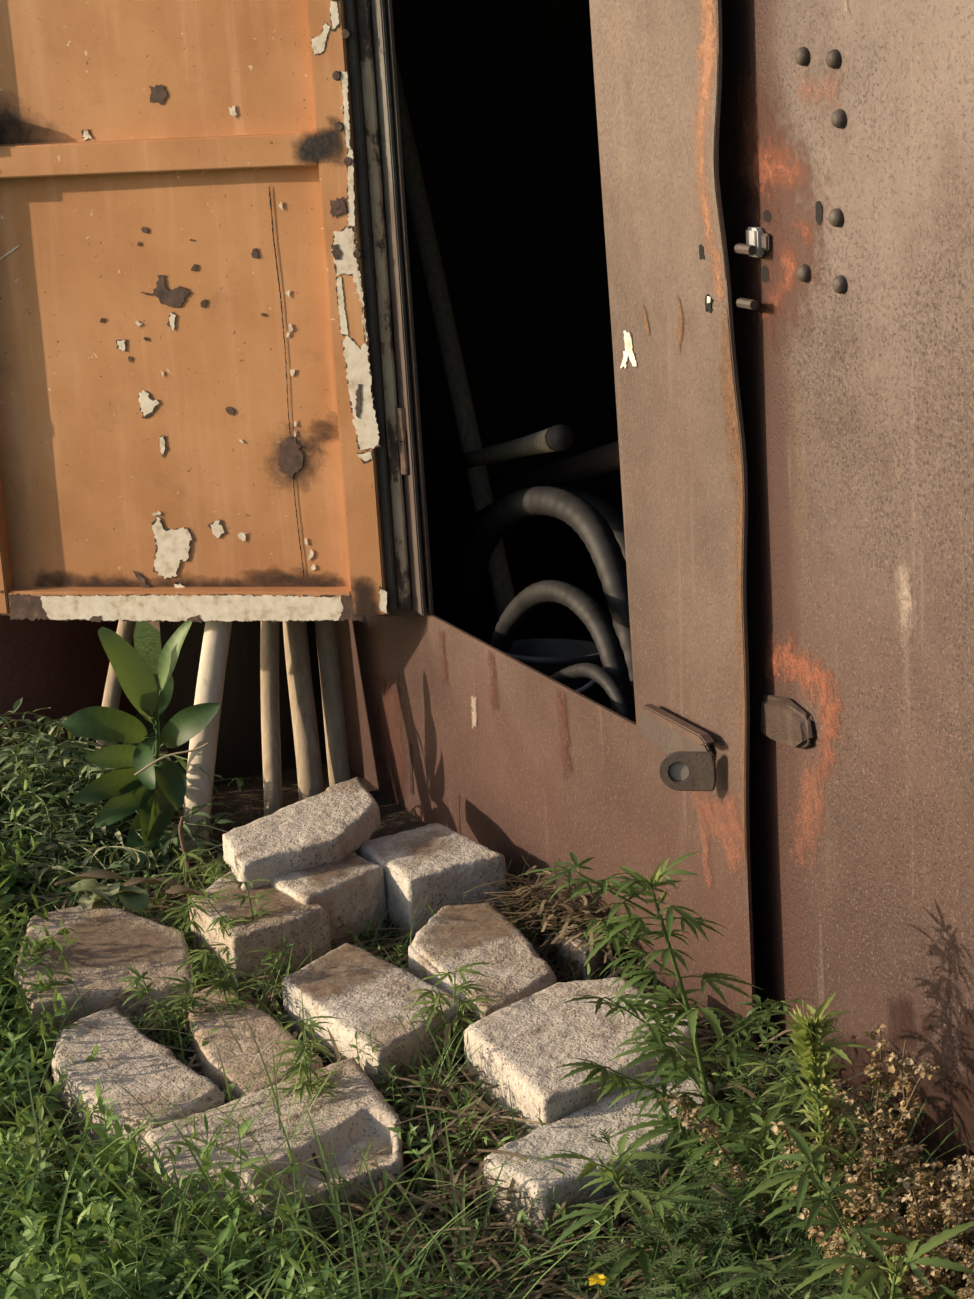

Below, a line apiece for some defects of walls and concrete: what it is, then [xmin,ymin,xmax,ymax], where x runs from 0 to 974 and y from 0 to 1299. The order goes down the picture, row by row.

peeling [311,1,340,55]
peeling [330,70,381,464]
rust [738,85,815,339]
peeling [0,511,362,623]
rust [35,570,378,621]
peeling [378,586,389,615]
rust [768,641,841,863]